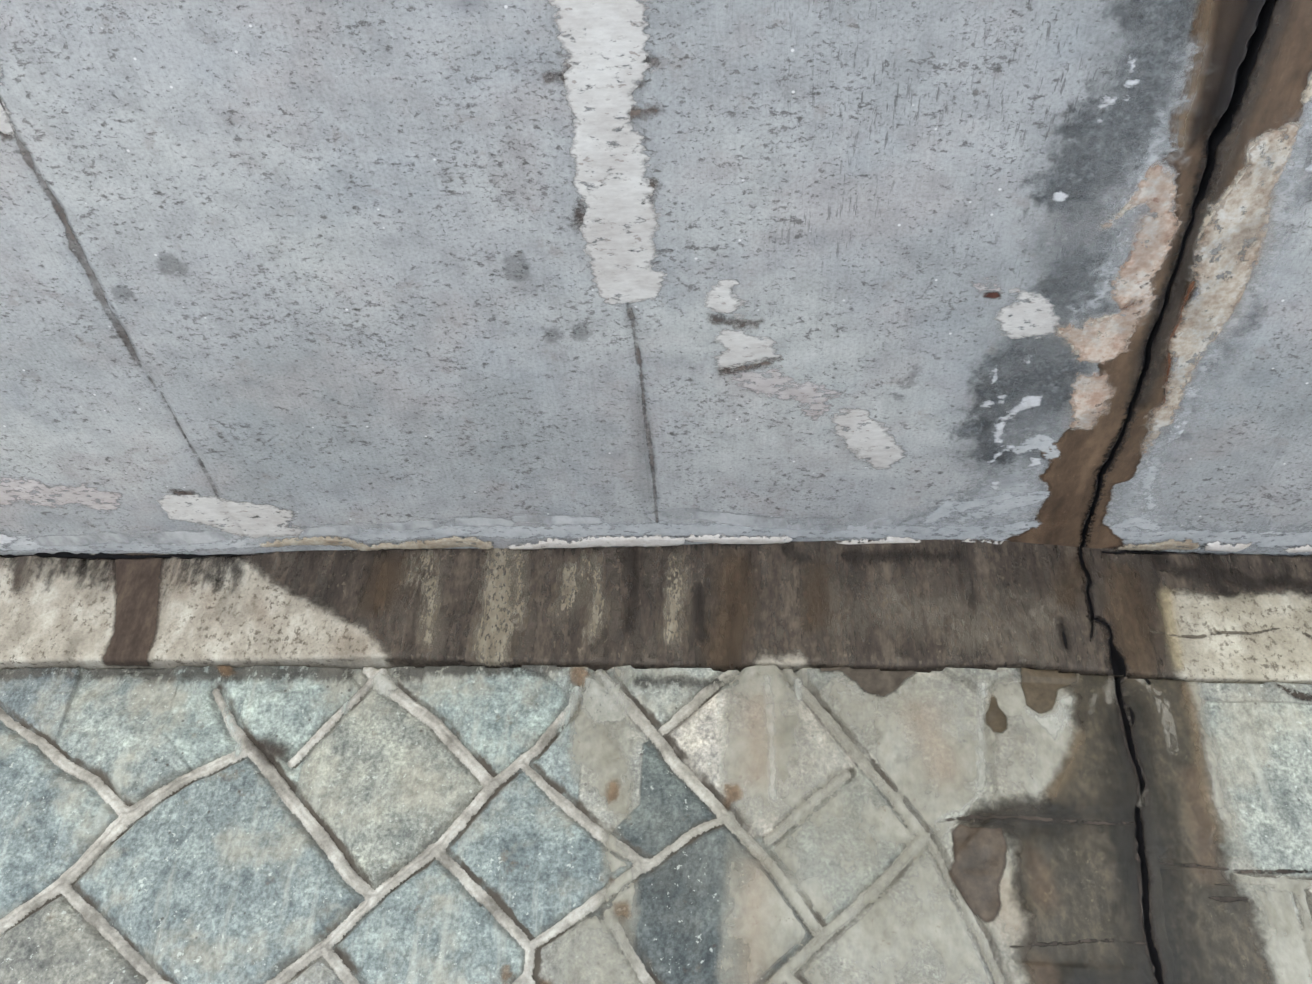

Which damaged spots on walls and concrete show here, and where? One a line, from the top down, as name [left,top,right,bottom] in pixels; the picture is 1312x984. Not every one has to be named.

peeling [0,67,15,141]
peeling [543,0,665,305]
damp [0,0,1248,667]
peeling [705,279,906,469]
crack [947,0,1312,984]
damp [1081,0,1312,984]
damp [229,539,1155,984]